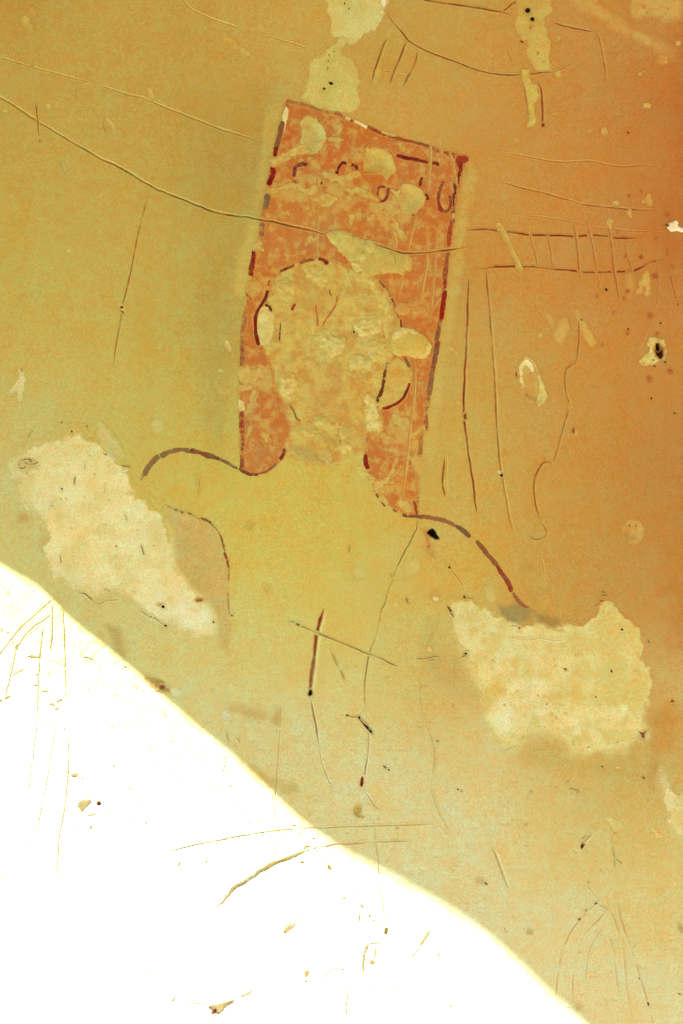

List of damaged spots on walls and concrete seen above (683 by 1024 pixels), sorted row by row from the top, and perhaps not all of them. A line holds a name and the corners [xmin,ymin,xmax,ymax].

crack [0,94,327,236]
flaking render [264,0,427,239]
flaking render [513,0,561,127]
crack [365,239,468,265]
spalling [514,355,548,407]
peeling [637,336,668,367]
spalling [0,417,216,643]
spalling [427,587,654,751]